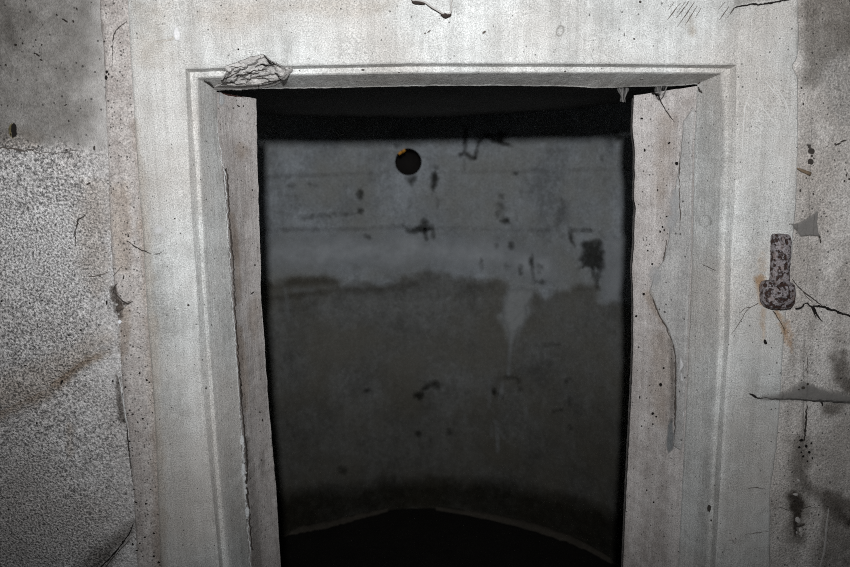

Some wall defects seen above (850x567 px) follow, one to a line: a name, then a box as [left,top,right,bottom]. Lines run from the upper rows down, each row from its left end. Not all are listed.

crack [731,0,788,12]
spalling [212,54,293,90]
spalling [106,266,133,317]
water stain [503,288,534,375]
water stain [581,238,631,302]
crack [732,279,850,333]